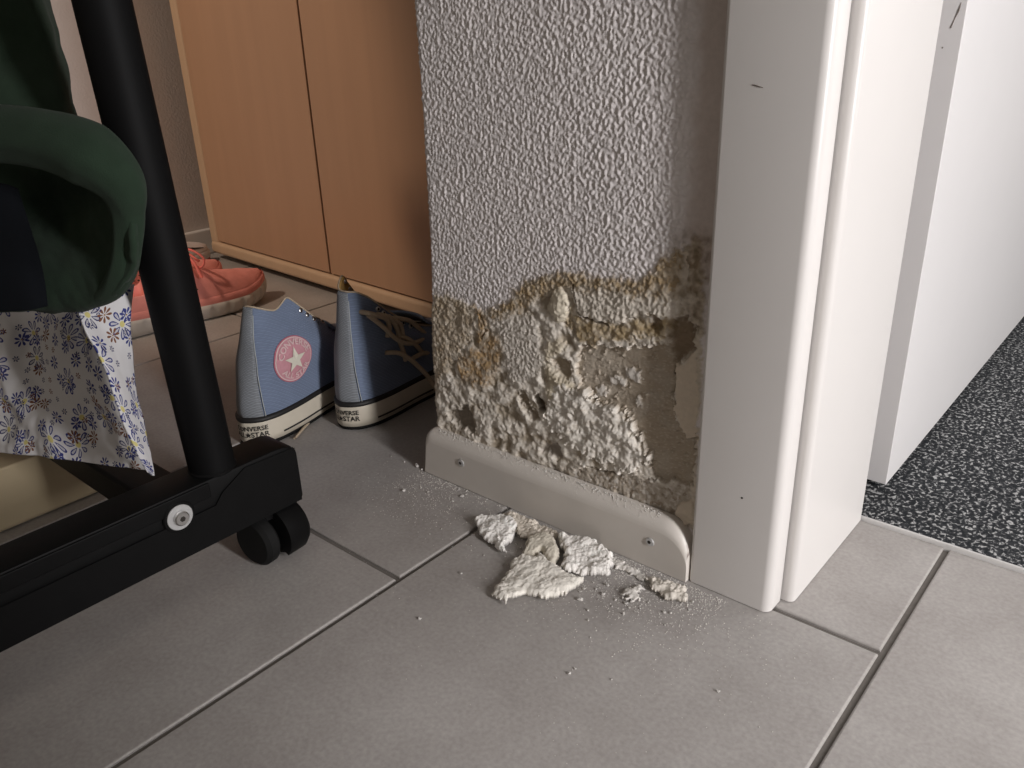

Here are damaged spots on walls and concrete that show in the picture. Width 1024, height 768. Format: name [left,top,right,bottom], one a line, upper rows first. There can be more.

flaking render [431,236,707,529]